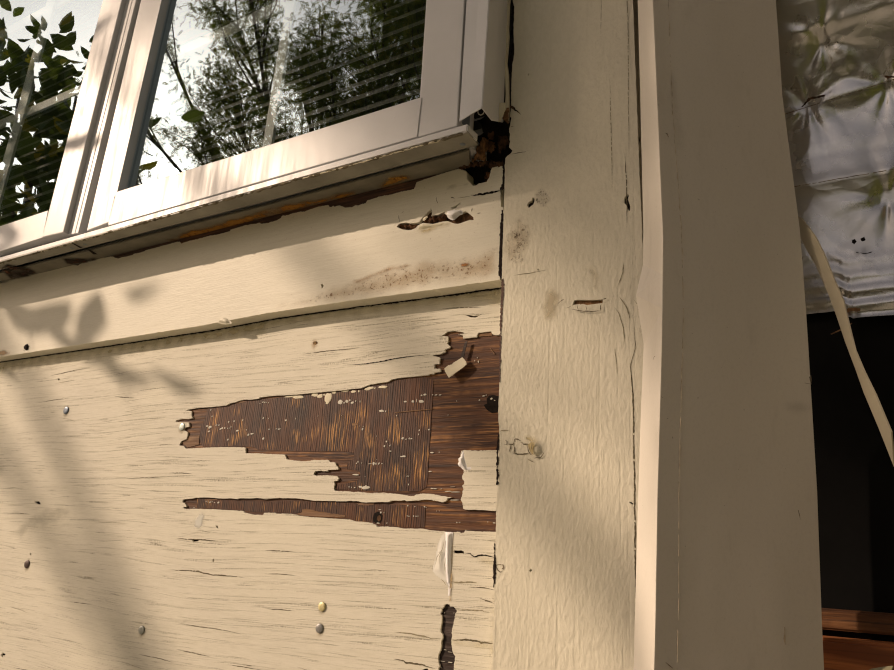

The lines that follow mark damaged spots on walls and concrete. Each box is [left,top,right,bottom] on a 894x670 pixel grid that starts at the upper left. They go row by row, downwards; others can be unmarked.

spalling [458,105,520,185]
peeling [111,175,436,258]
spalling [399,210,474,230]
peeling [177,332,501,670]
crack [176,569,237,577]
crack [450,543,496,612]
crack [398,632,493,644]